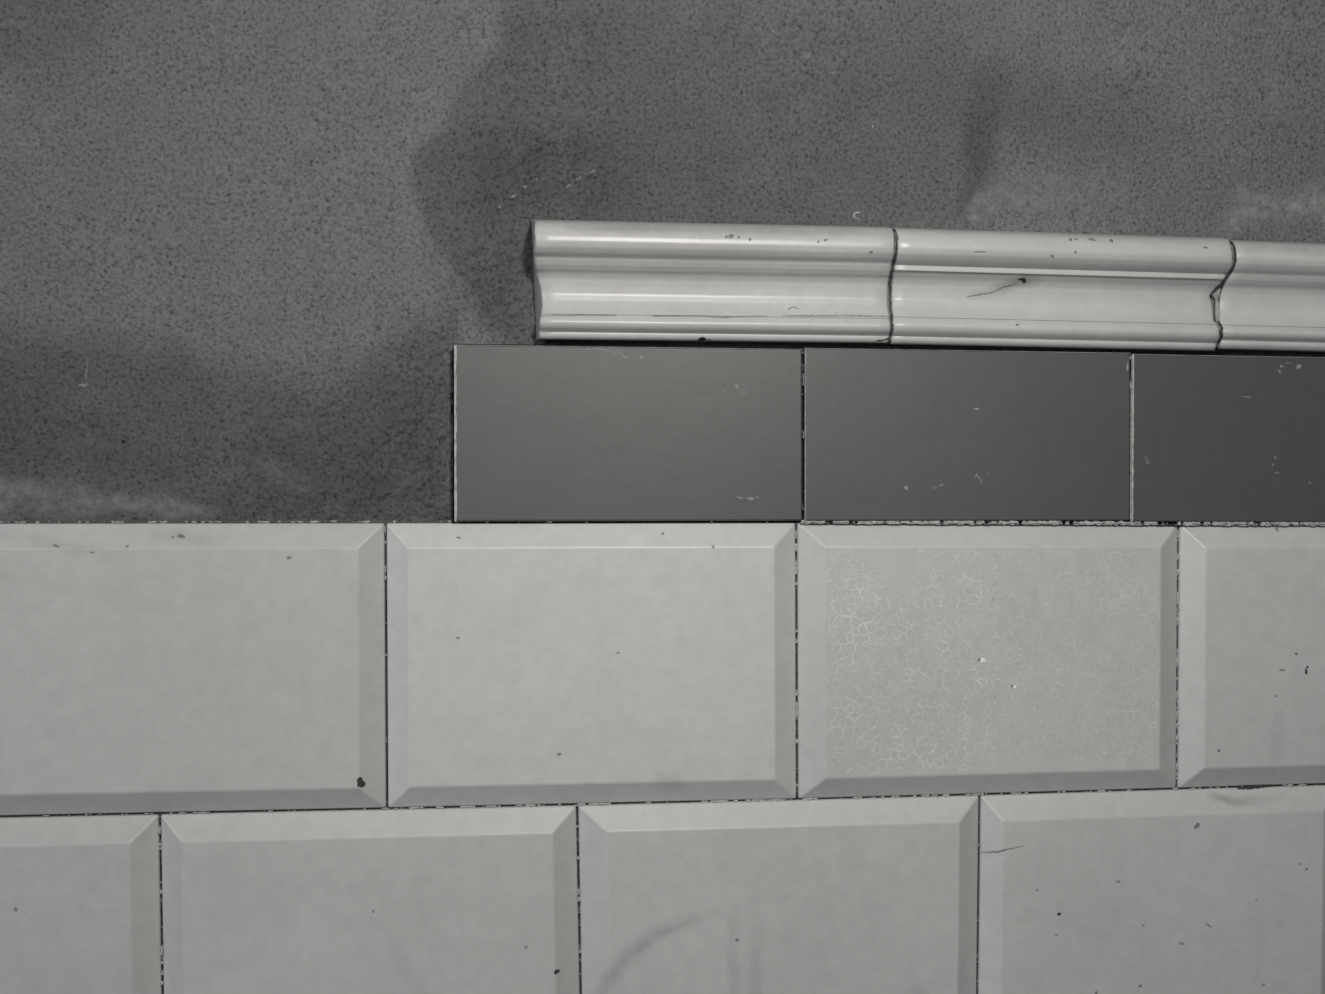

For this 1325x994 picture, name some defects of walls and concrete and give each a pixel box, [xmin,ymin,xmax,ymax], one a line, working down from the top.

crack [1210,243,1237,347]